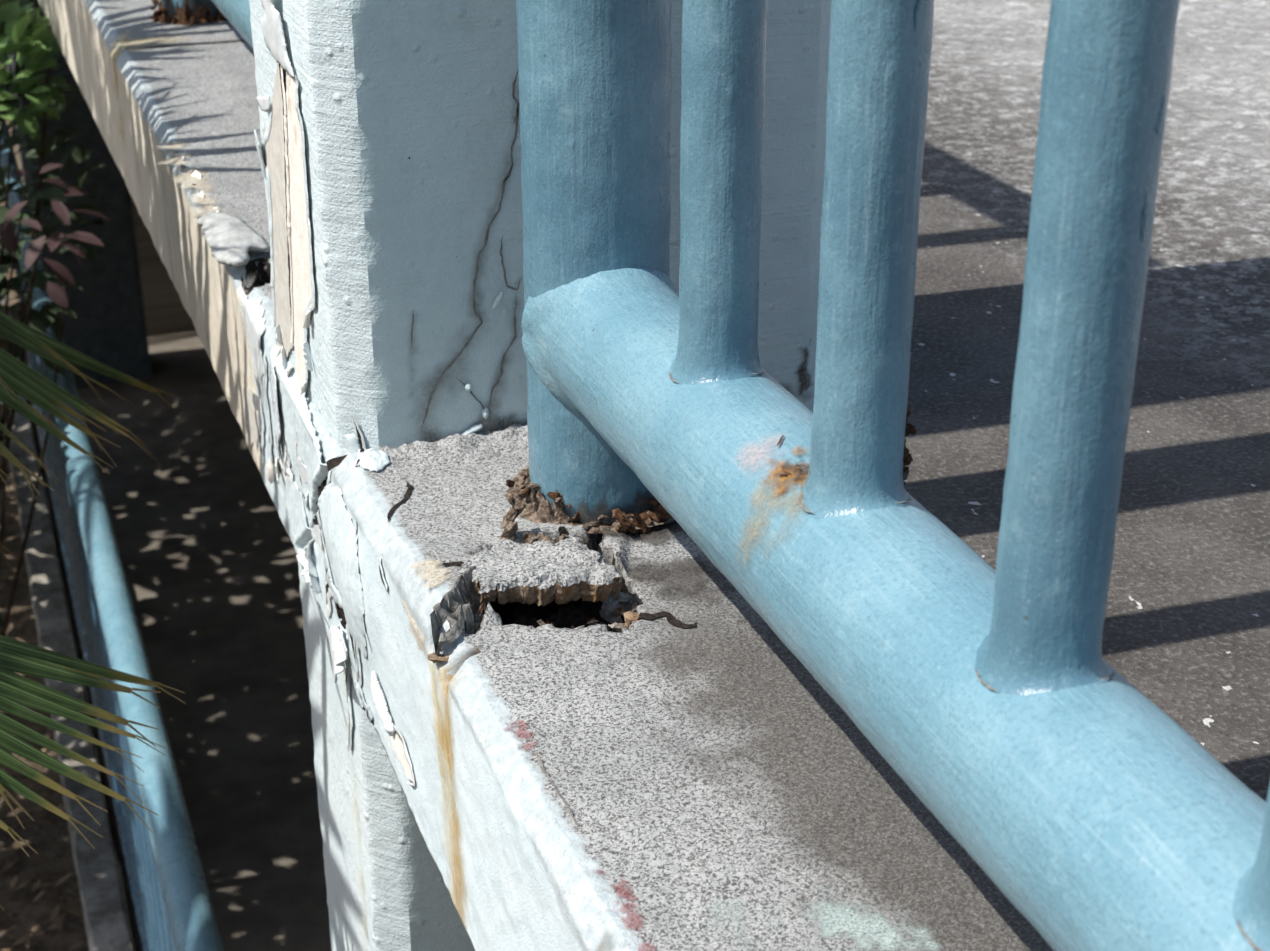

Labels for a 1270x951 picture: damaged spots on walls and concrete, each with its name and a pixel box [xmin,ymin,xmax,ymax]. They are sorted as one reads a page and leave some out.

peeling [196,0,328,511]
crack [419,72,523,441]
crack [408,312,416,349]
rust [499,467,687,552]
rust [745,448,810,545]
spalling [402,526,639,663]
peeling [296,546,415,787]
rust [433,677,453,774]